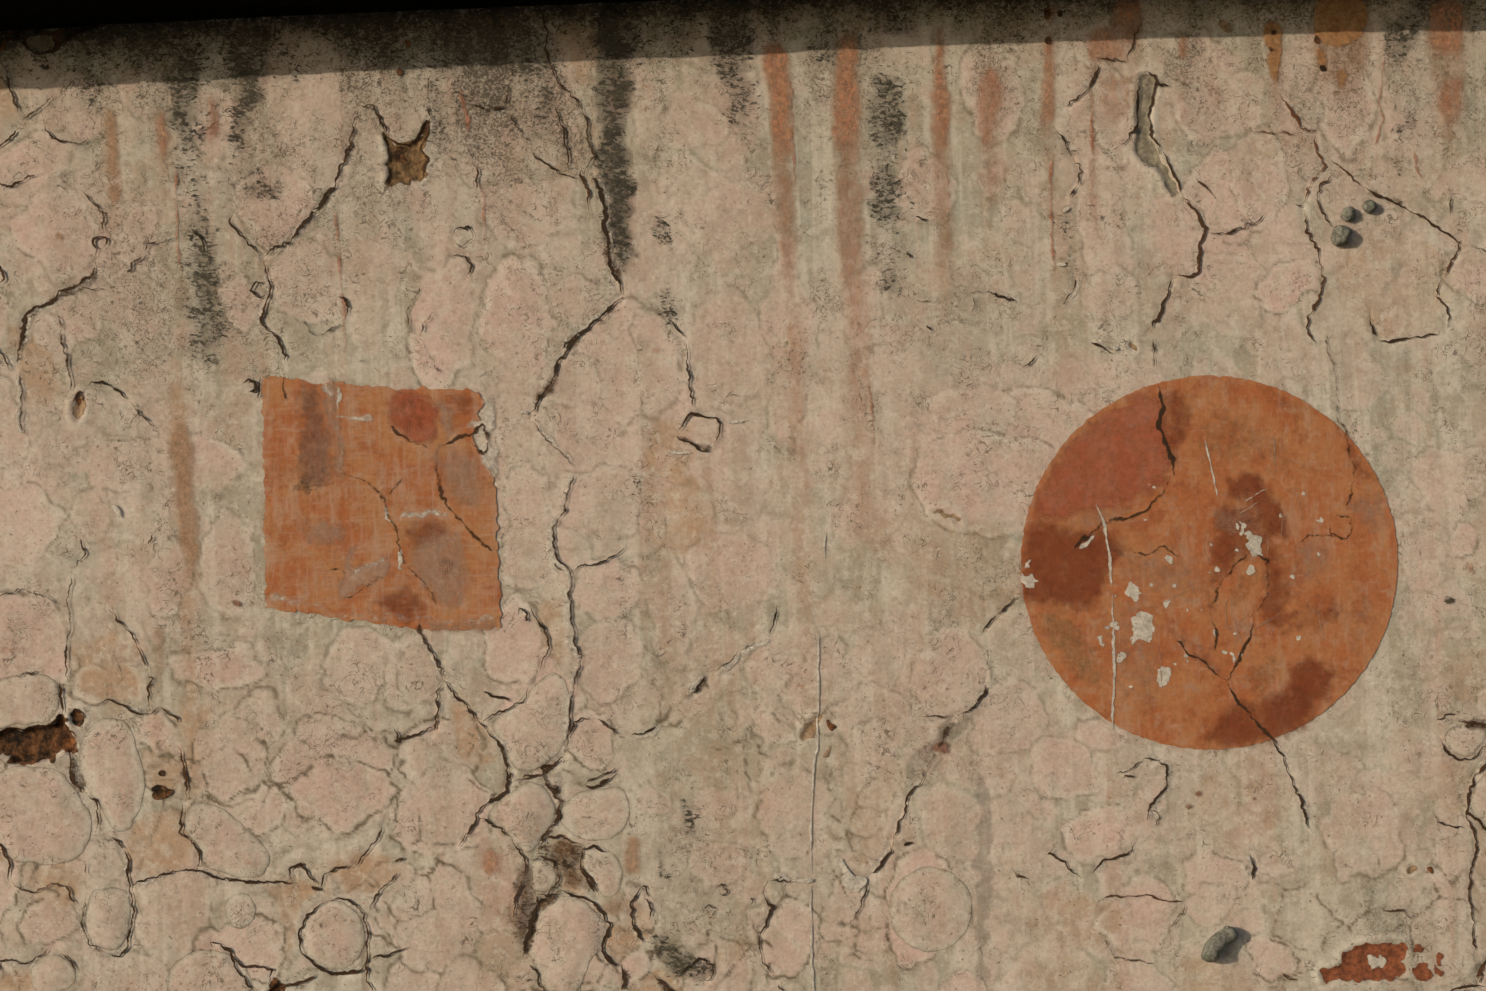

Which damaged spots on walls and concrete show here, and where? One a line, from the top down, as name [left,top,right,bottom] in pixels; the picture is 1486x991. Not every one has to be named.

crack [0,79,432,432]
flaking render [382,120,430,187]
water stain [0,0,1315,379]
corrosion [764,46,796,179]
crack [1057,20,1486,556]
corrosion [1263,22,1282,81]
corrosion [1314,0,1368,86]
water stain [1364,0,1486,68]
crack [361,16,721,991]
flaking render [0,708,85,766]
crack [0,539,405,991]
flaking render [1319,942,1444,984]